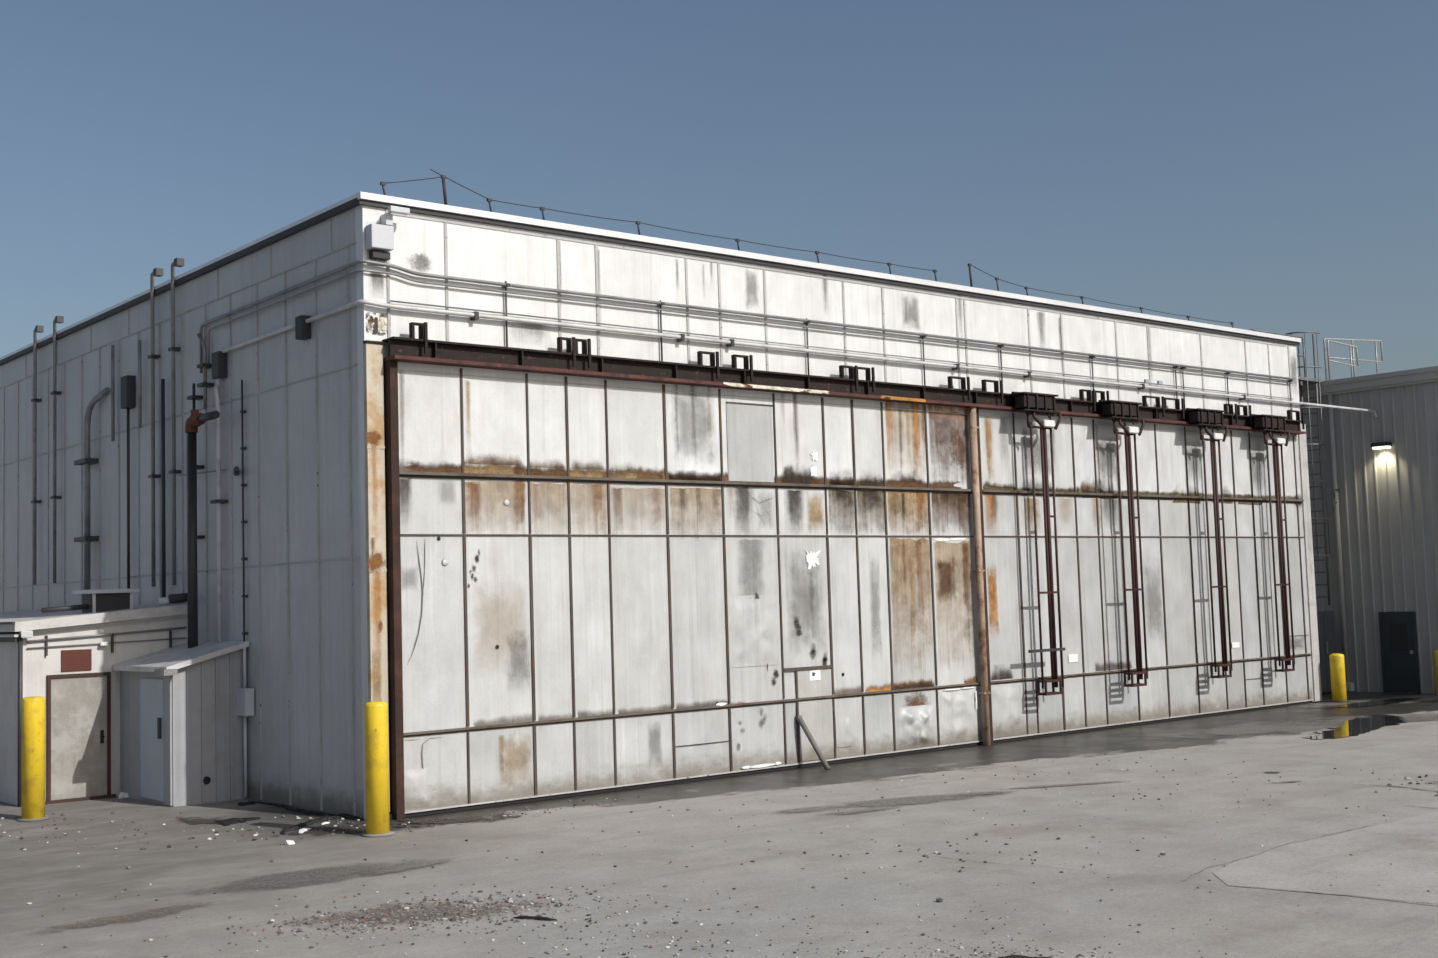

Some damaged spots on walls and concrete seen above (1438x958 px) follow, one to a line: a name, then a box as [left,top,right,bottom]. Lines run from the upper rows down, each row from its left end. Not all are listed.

rust [367,431,382,455]
rust [409,457,784,507]
water stain [737,487,750,518]
rust [816,401,1295,626]
rust [367,538,384,635]